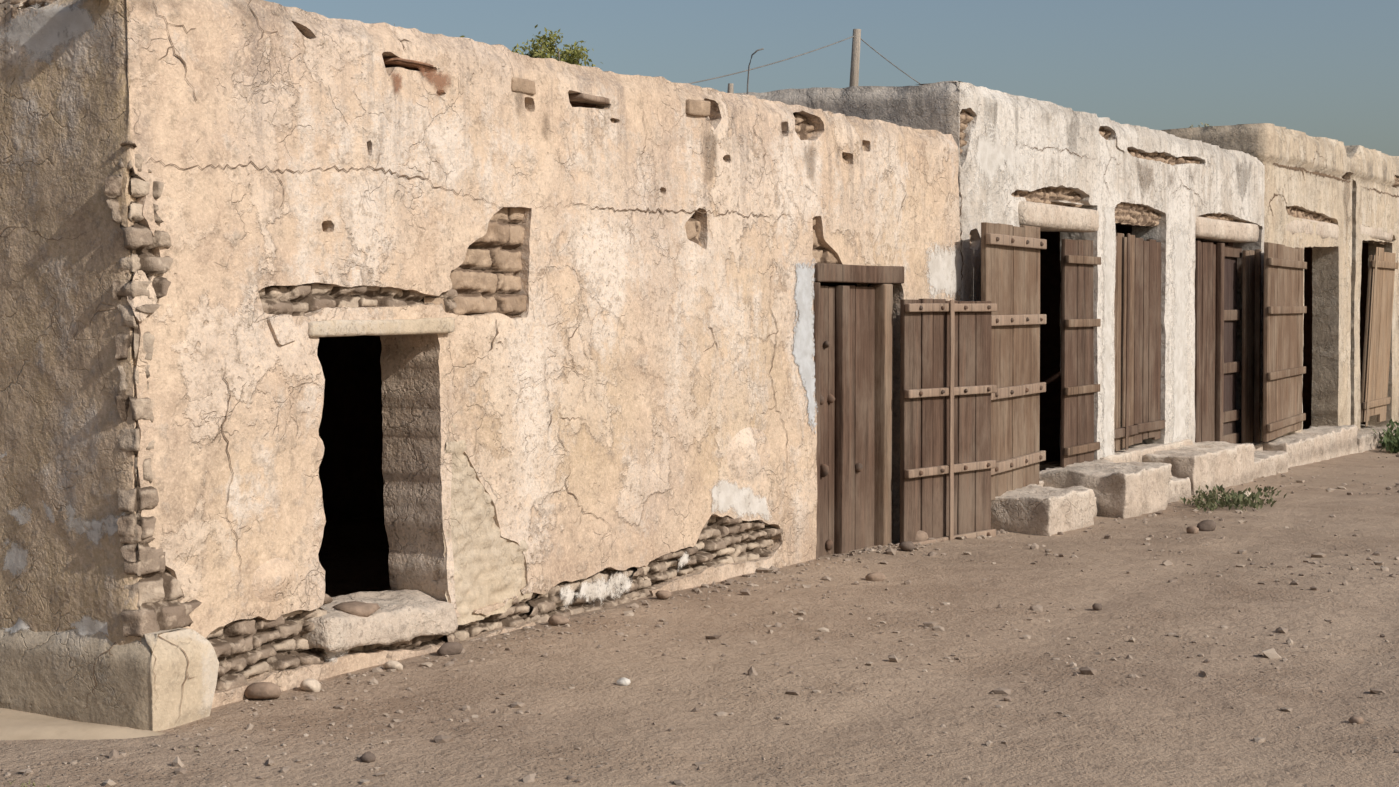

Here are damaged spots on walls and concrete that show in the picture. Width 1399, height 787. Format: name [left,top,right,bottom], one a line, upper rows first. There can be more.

crack [148,153,494,206]
crack [534,104,807,238]
flaking render [424,207,527,318]
spalling [9,141,202,644]
peeling [3,540,28,575]
peeling [561,585,574,605]